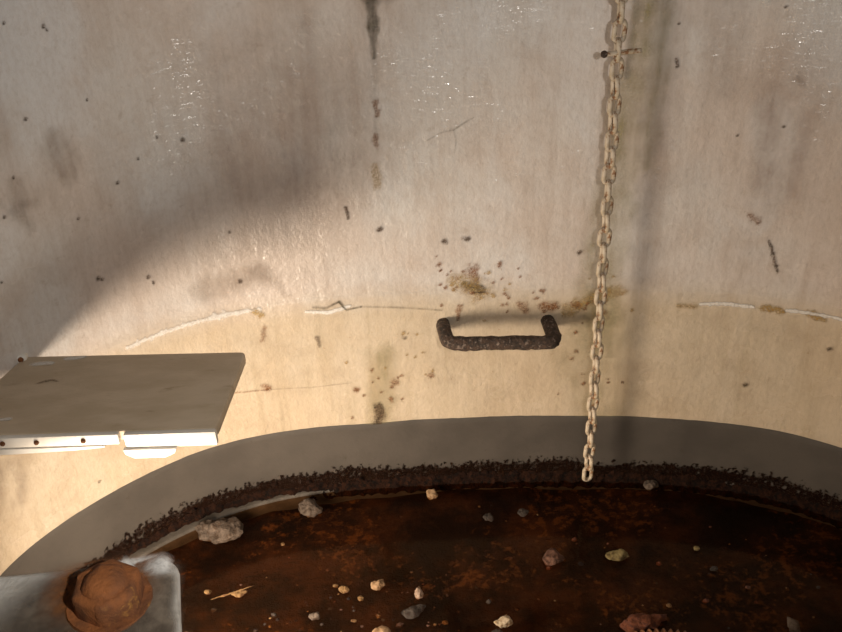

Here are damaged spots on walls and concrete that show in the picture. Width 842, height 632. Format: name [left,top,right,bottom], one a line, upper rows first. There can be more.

leakage [366,0,377,33]
rust [436,256,511,313]
rust [532,289,595,317]